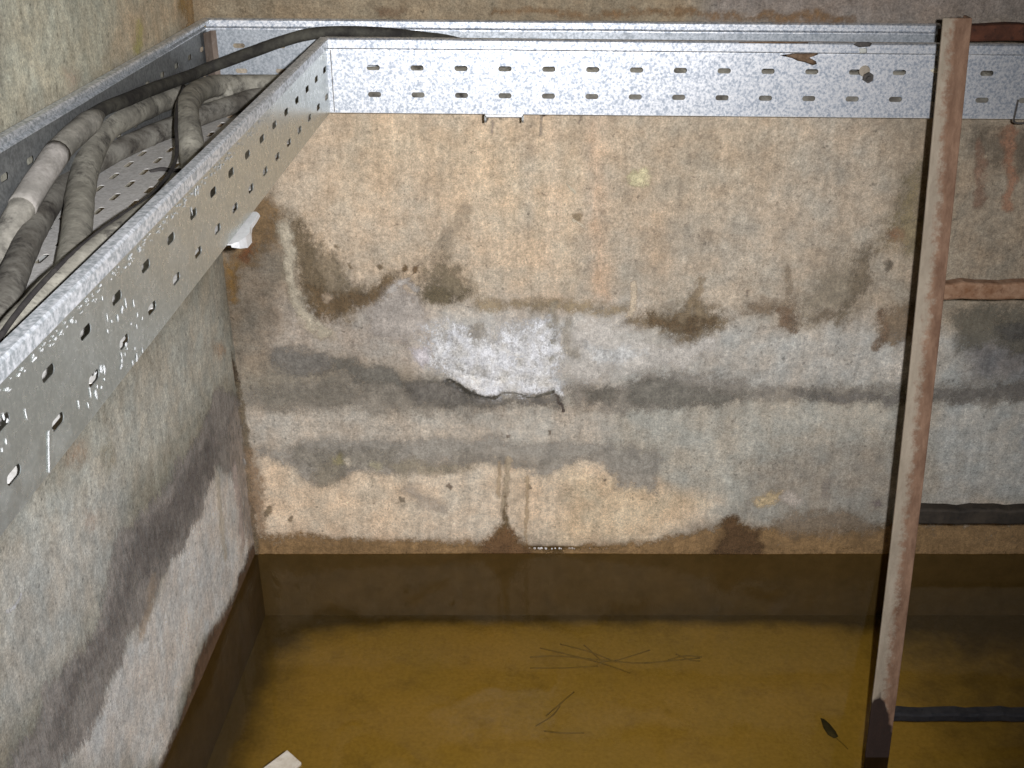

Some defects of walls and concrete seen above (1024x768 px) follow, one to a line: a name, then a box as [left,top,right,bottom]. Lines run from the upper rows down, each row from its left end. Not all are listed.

damp [748,158,926,333]
damp [872,304,914,351]
damp [954,303,1024,354]
damp [933,381,1024,406]
damp [8,221,906,768]
damp [915,524,1024,554]